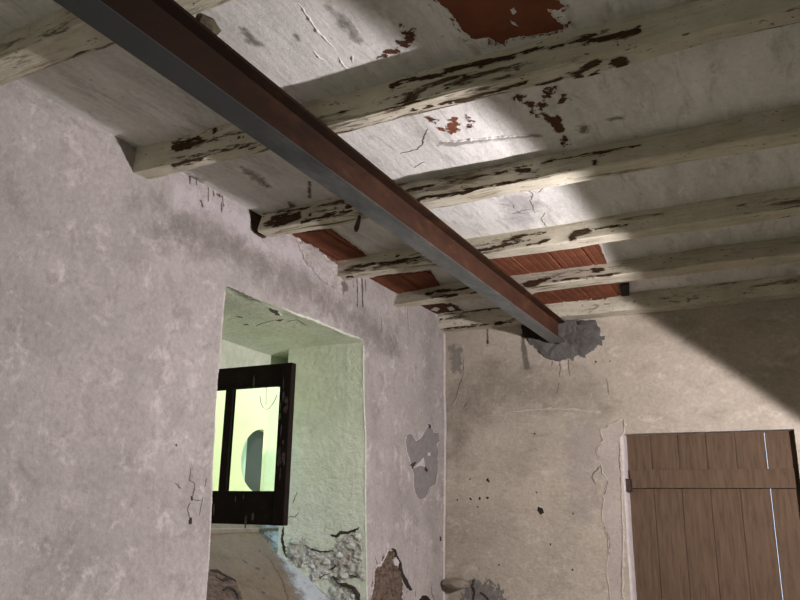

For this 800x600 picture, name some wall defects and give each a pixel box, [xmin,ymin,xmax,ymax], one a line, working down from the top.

crack [296,2,354,69]
flaking render [377,24,416,59]
flaking render [388,0,642,147]
peeling [171,127,261,167]
peeling [542,144,641,165]
crack [503,188,547,227]
flaking render [249,201,560,344]
flaking render [477,224,629,304]
crack [175,465,207,524]
flaking render [405,424,440,501]
spalling [286,529,434,600]
flaking render [460,576,509,600]